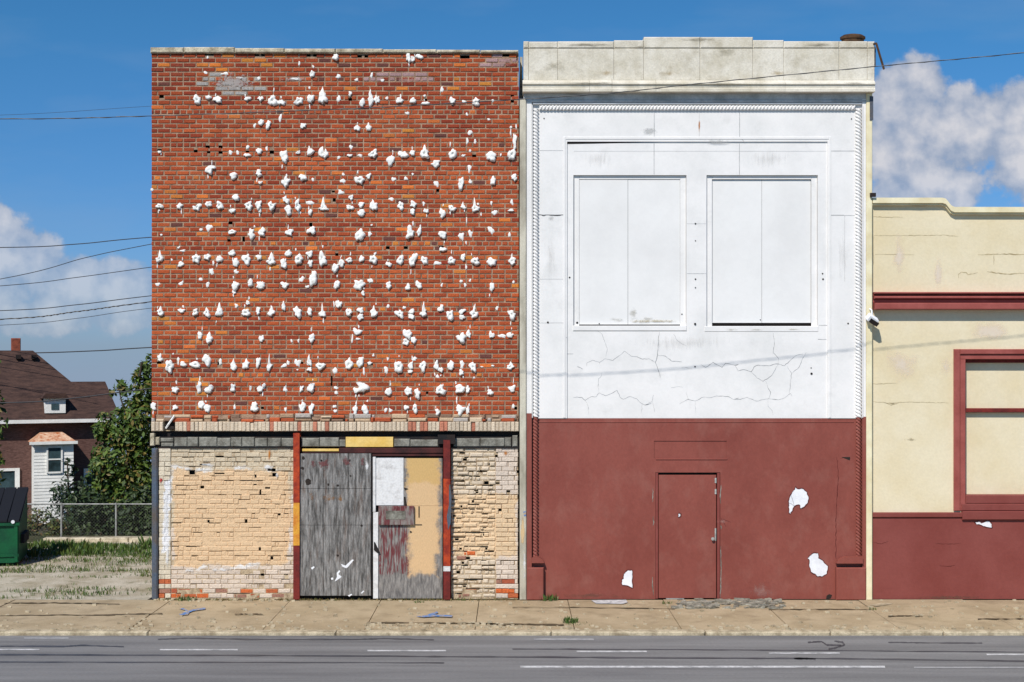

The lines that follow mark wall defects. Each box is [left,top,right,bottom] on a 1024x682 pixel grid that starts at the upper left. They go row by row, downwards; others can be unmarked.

crack [577,331,806,413]
peeling [788,486,809,514]
peeling [808,552,828,577]
peeling [621,570,633,588]